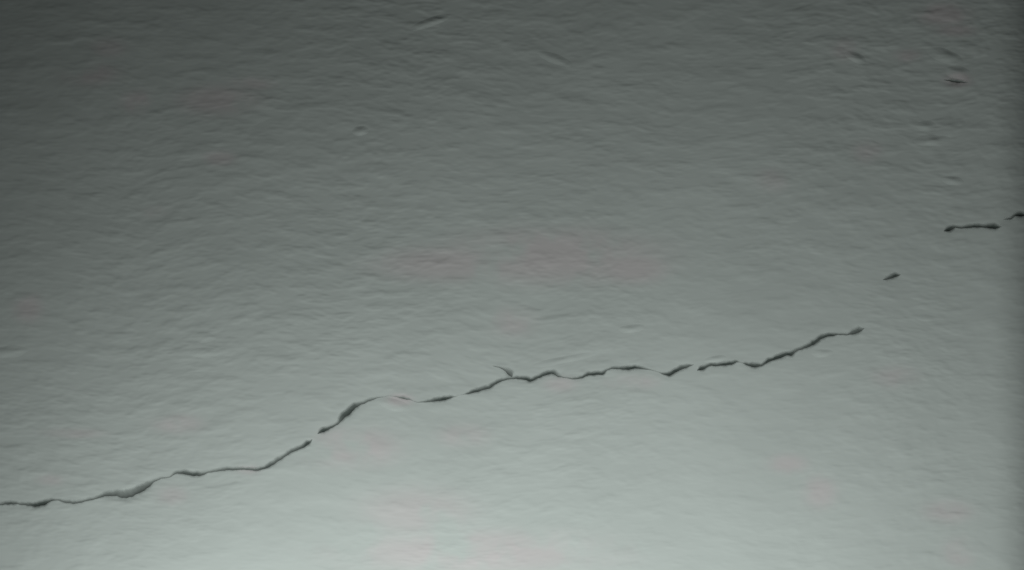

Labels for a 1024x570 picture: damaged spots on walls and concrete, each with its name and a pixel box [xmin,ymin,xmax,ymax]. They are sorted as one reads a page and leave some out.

crack [944,213,1024,231]
crack [0,328,864,507]